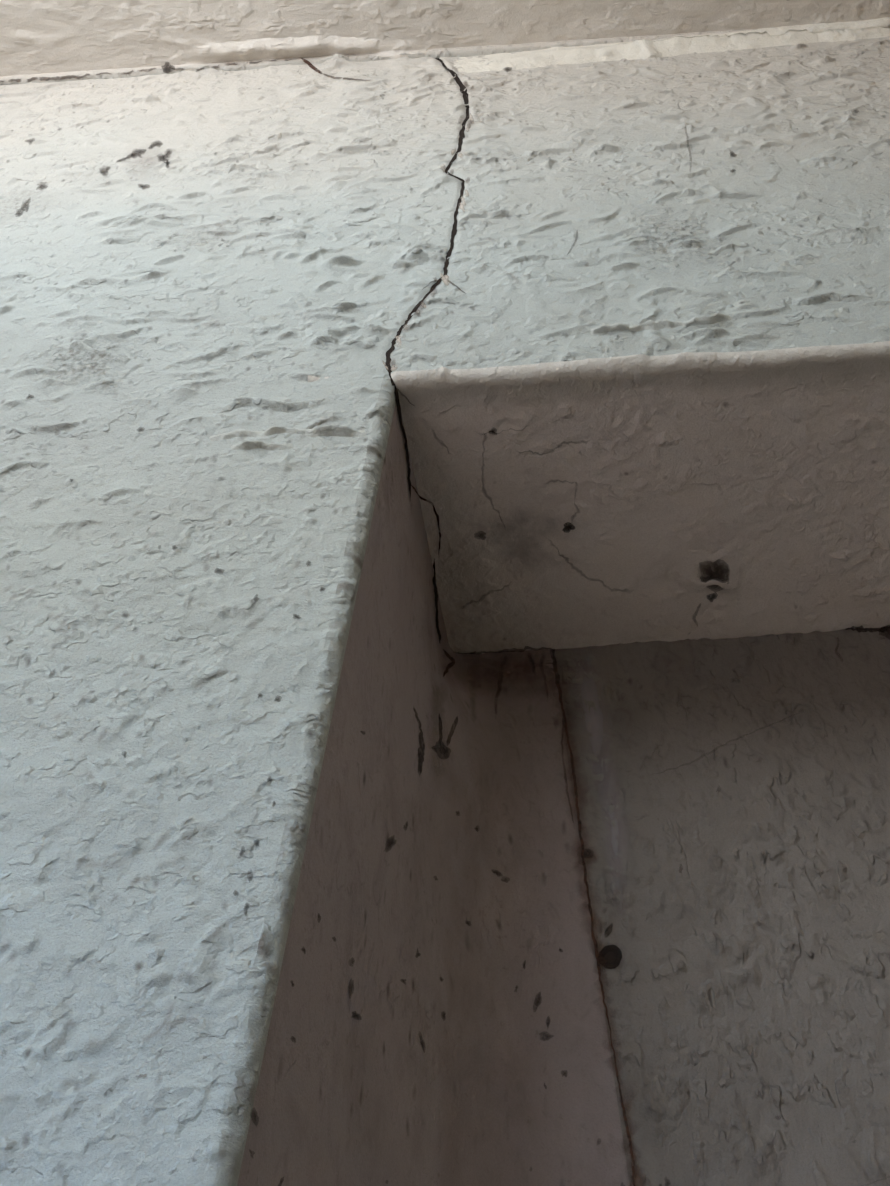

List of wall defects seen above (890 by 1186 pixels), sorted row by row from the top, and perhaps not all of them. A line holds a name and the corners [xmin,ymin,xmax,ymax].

crack [383,58,473,677]
spalling [678,544,747,602]